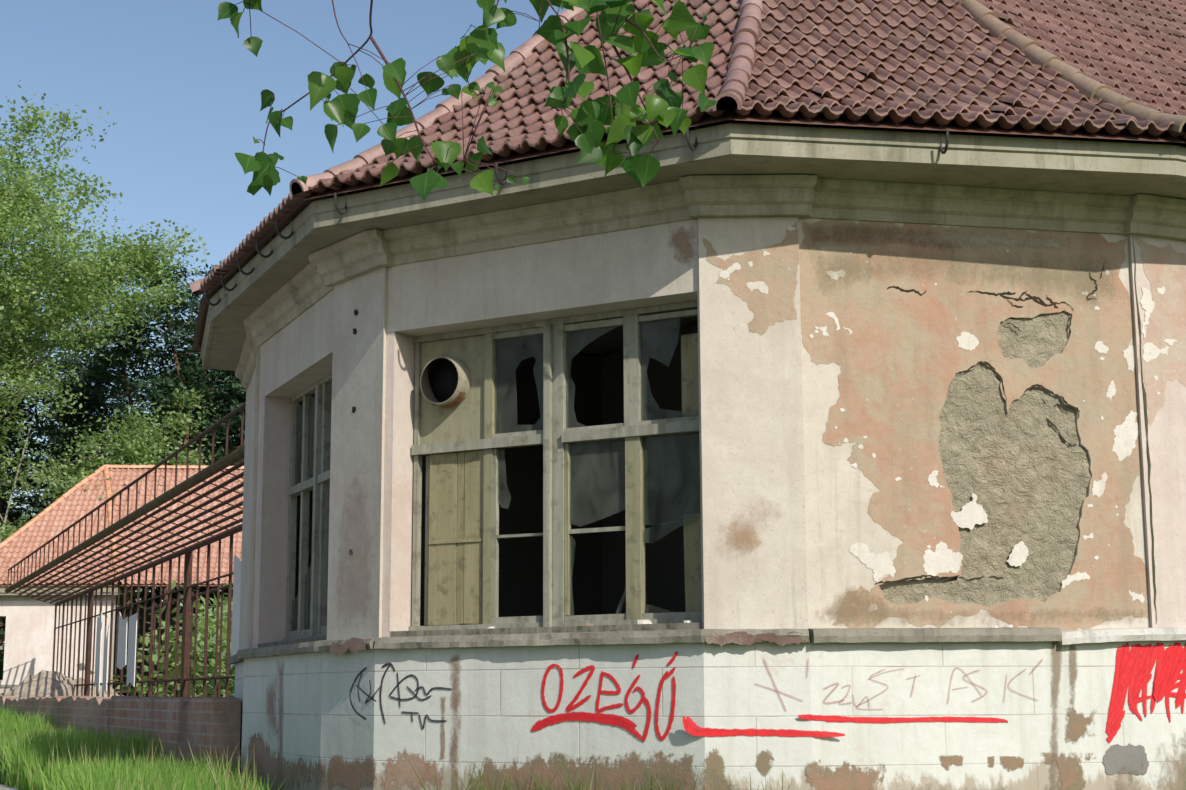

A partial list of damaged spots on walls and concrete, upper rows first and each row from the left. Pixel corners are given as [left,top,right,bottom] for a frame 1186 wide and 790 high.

crack [888,286,926,295]
crack [969,262,1105,335]
crack [956,361,1080,446]
peeling [703,219,1186,631]
crack [1132,235,1157,624]
peeling [248,732,443,790]
peeling [469,749,730,790]
peeling [755,751,774,776]
peeling [806,760,885,790]
peeling [940,755,963,771]
peeling [988,756,1024,771]